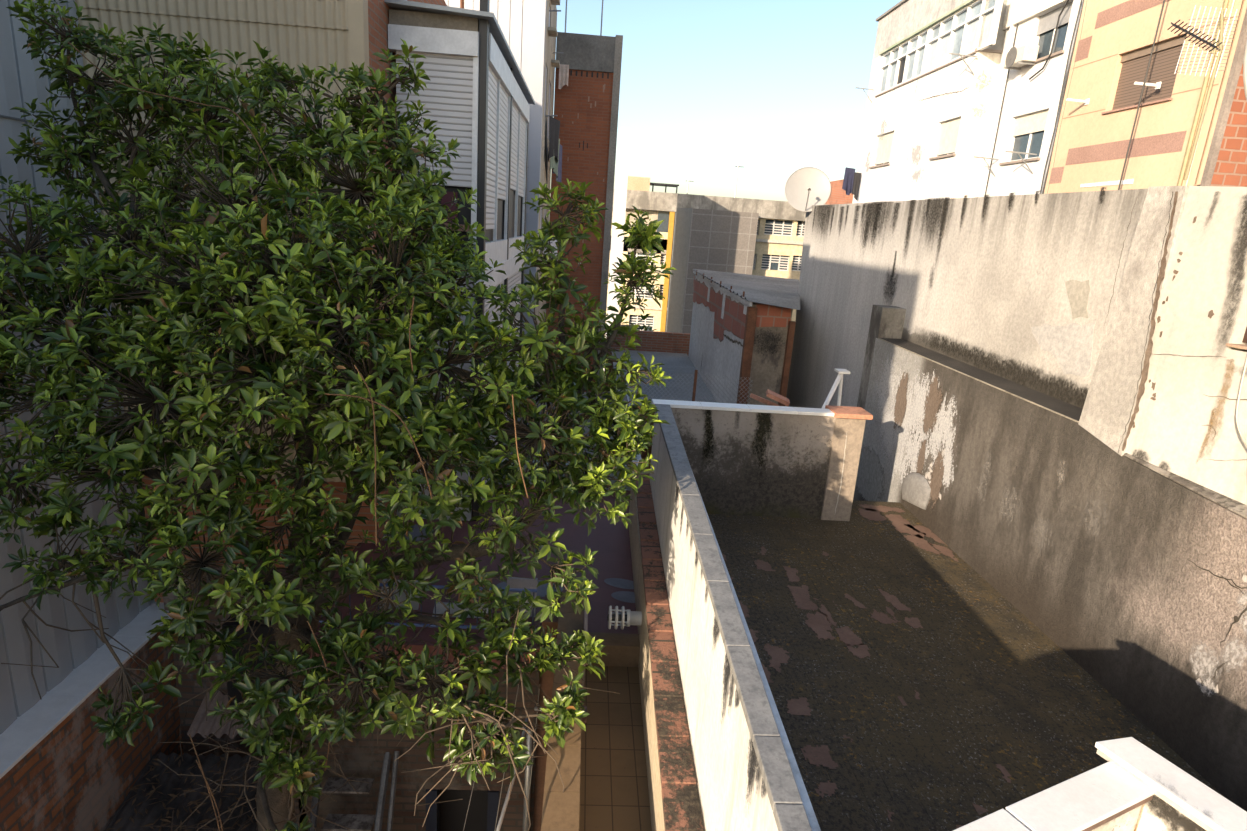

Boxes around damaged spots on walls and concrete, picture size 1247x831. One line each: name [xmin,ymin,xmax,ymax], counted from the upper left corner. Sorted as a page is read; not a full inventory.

leakage [812,195,968,304]
leakage [1222,196,1247,341]
leakage [753,412,772,474]
peeling [873,353,960,509]
corrosion [1202,361,1233,452]
peeling [858,508,959,562]
peeling [739,601,790,683]
peeling [805,598,871,658]
crack [1189,560,1247,682]
leakage [660,551,704,829]
leakage [747,739,766,803]
peeling [801,745,838,798]